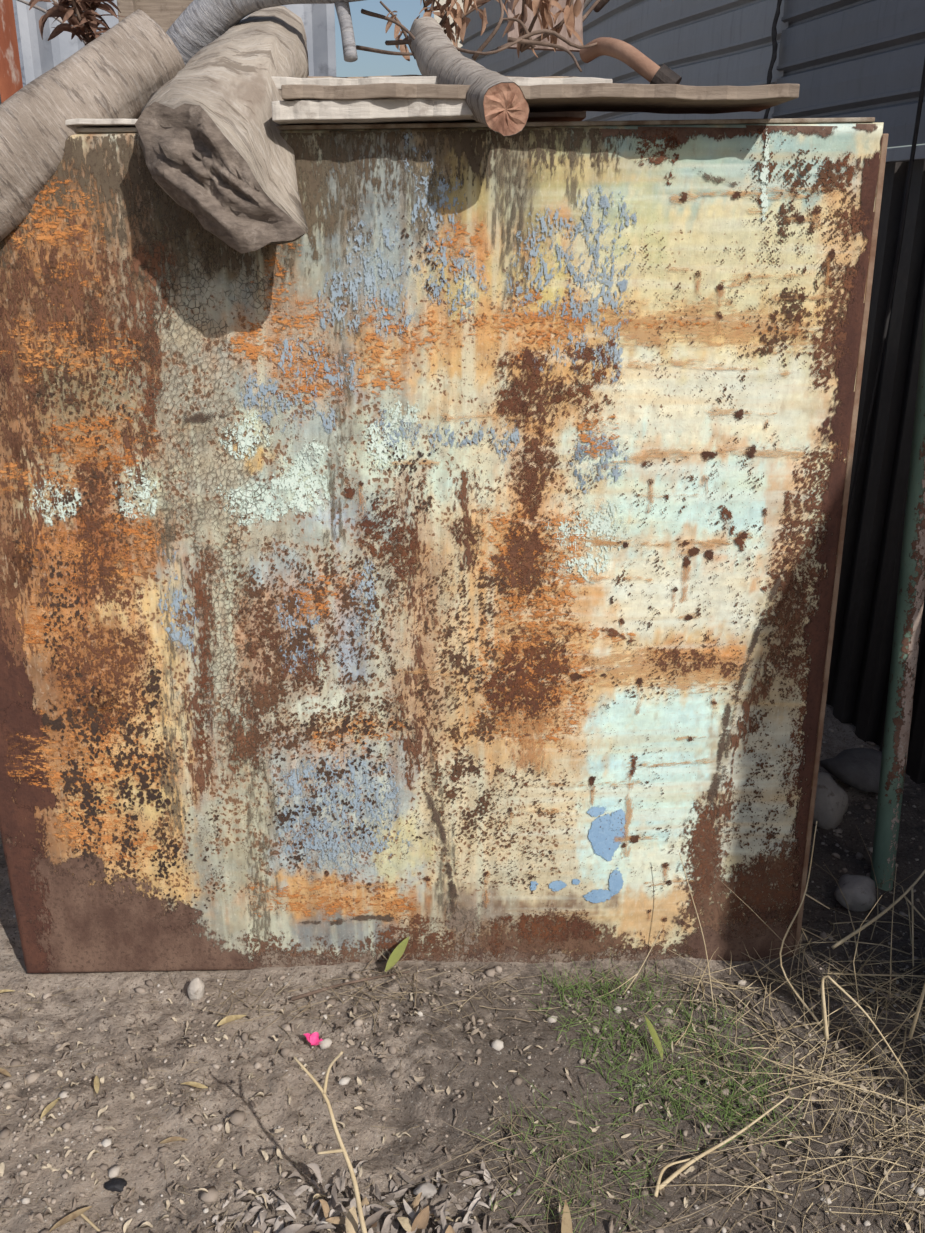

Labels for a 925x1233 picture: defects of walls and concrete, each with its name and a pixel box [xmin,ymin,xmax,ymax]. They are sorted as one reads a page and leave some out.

spalling [215,131,876,926]
corrosion [885,438,925,804]